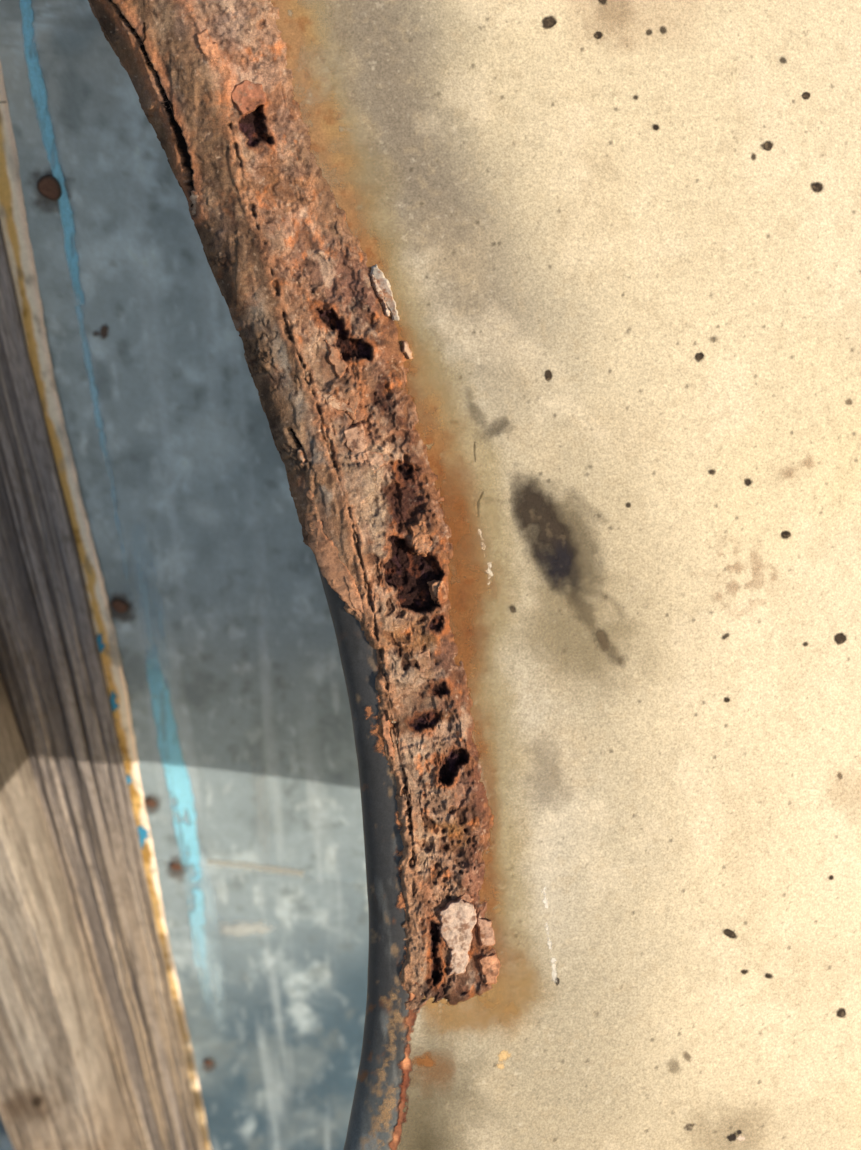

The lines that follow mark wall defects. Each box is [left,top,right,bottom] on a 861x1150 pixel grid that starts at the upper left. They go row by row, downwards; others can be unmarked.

rust [88,0,520,1150]
leakage [596,630,609,651]